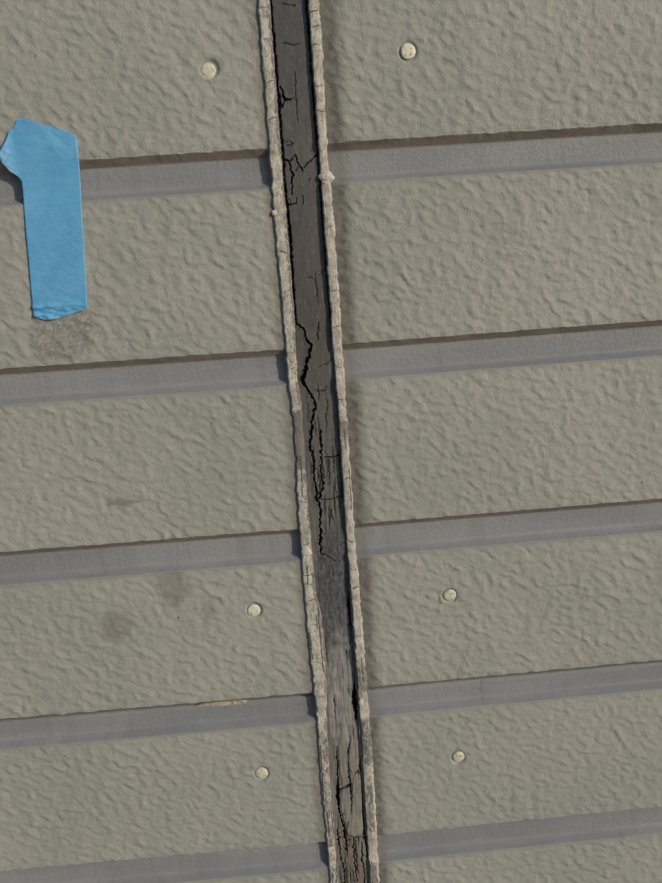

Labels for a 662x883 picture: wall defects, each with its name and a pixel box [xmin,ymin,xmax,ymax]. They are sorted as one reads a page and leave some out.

crack [261,0,368,883]